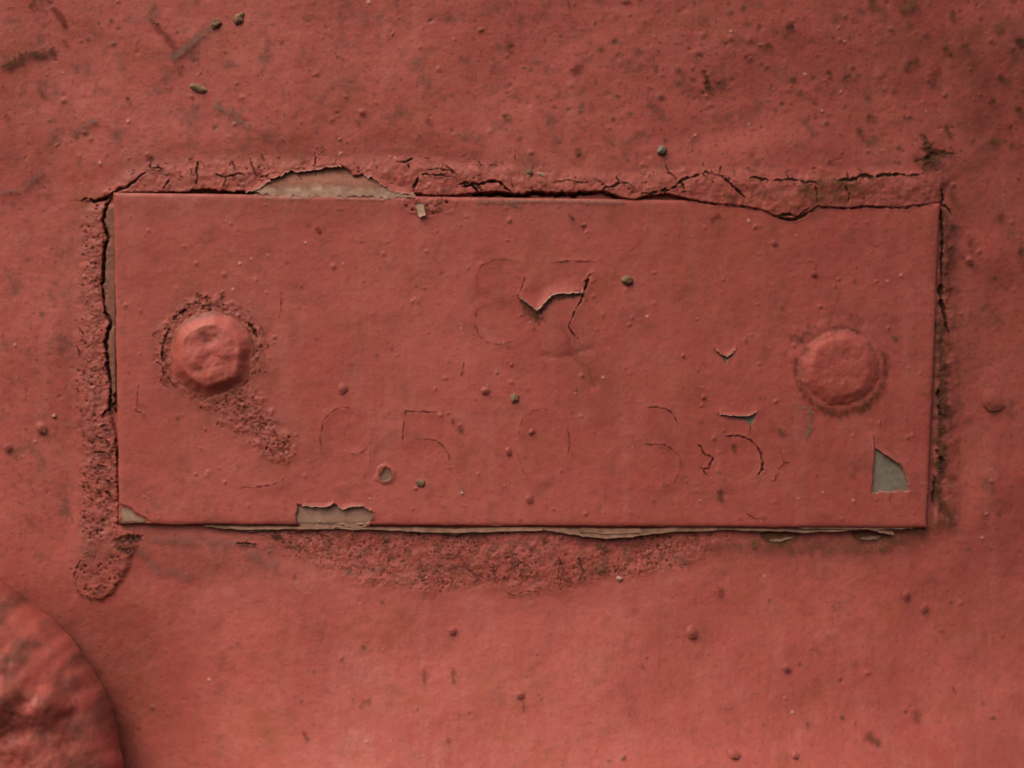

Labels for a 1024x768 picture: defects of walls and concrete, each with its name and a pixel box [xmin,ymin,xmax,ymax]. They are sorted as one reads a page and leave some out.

peeling [244,163,426,217]
crack [402,154,951,334]
crack [78,155,269,525]
peeling [871,440,910,494]
crack [932,450,945,503]
peeling [203,501,913,544]